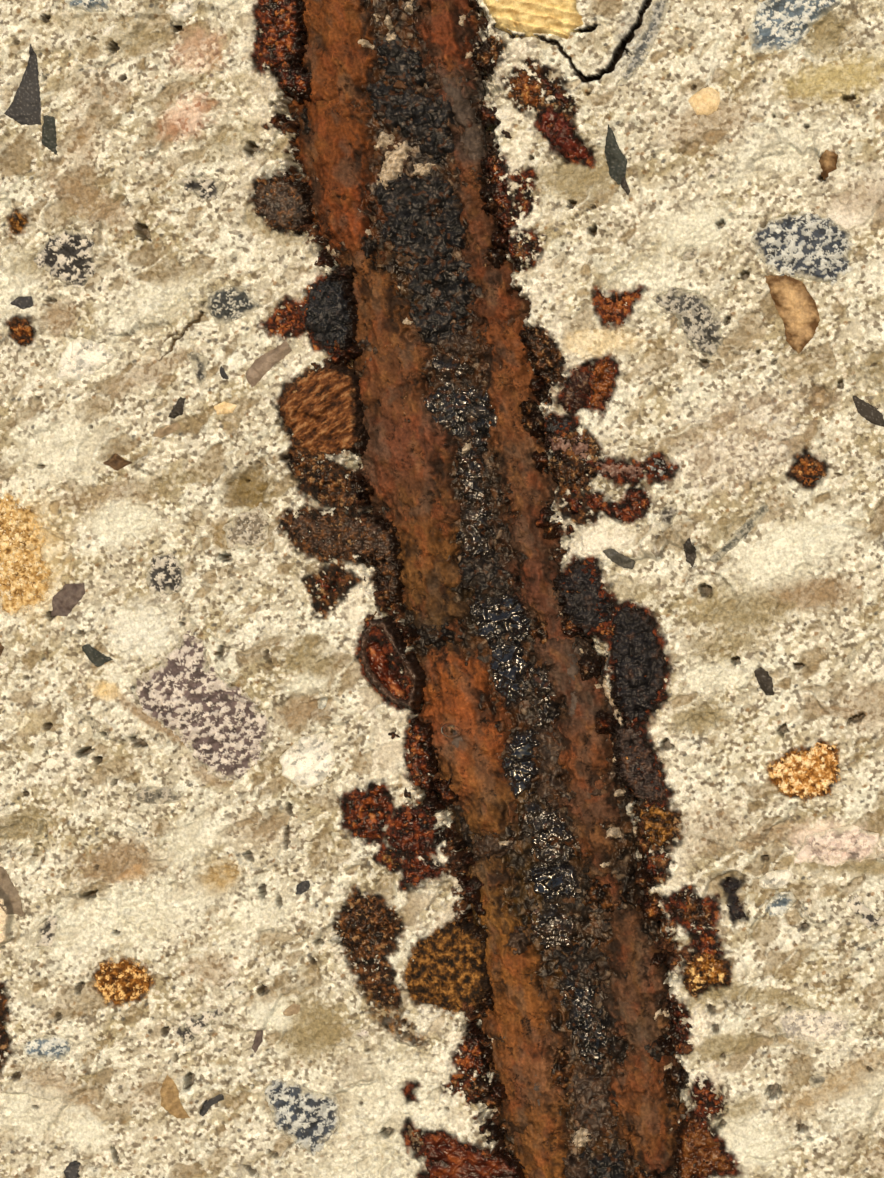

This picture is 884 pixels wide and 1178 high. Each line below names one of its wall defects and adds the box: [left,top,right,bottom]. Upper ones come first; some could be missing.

rust [248,0,575,1178]
crack [492,0,652,83]
rust [406,0,749,1178]